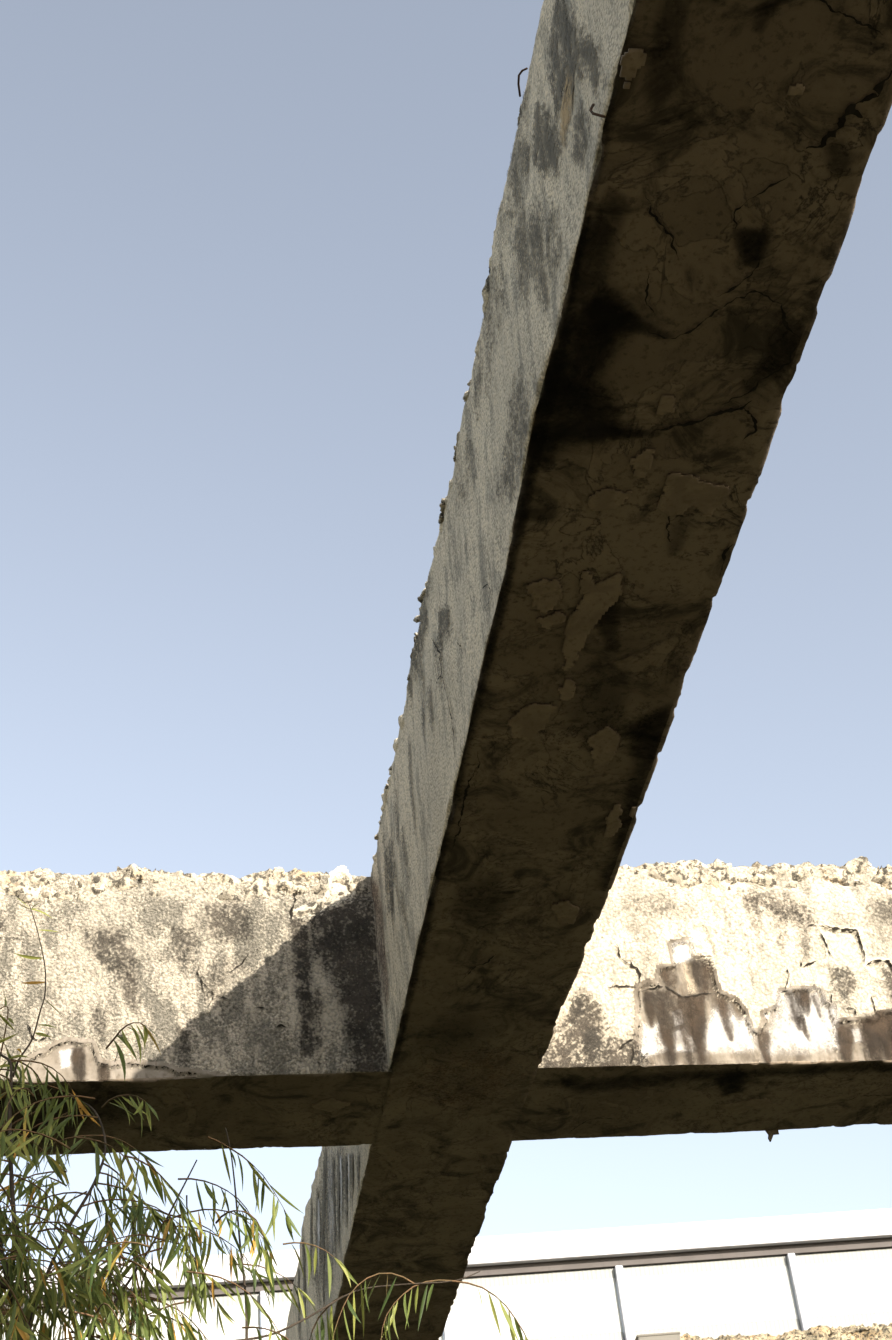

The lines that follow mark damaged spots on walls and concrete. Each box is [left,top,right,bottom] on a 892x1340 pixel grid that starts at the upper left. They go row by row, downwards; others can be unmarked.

crack [806,70,892,149]
crack [645,195,679,261]
crack [645,260,801,440]
water stain [289,0,671,1072]
crack [720,544,733,575]
water stain [85,927,141,1011]
spalling [0,864,368,923]
water stain [171,900,253,966]
spalling [617,856,892,891]
flaking render [633,919,892,1067]
flaking render [19,1037,228,1082]
water stain [541,988,892,1096]